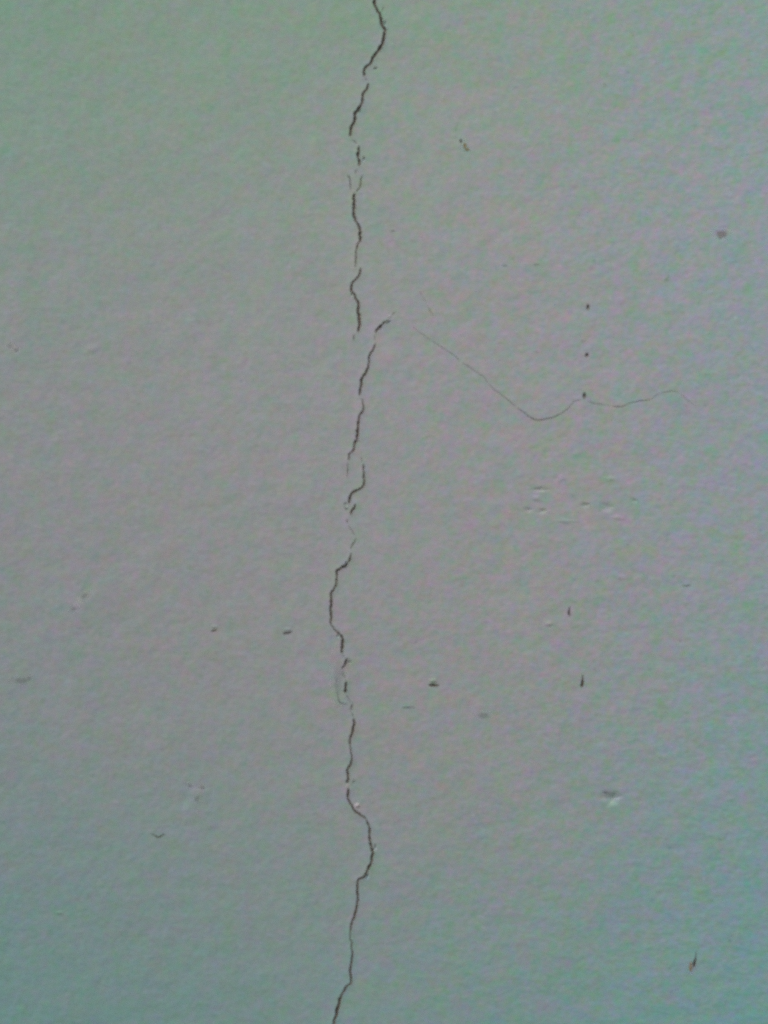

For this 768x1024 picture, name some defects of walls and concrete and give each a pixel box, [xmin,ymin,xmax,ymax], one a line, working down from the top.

crack [329,0,395,1024]
crack [417,291,695,421]